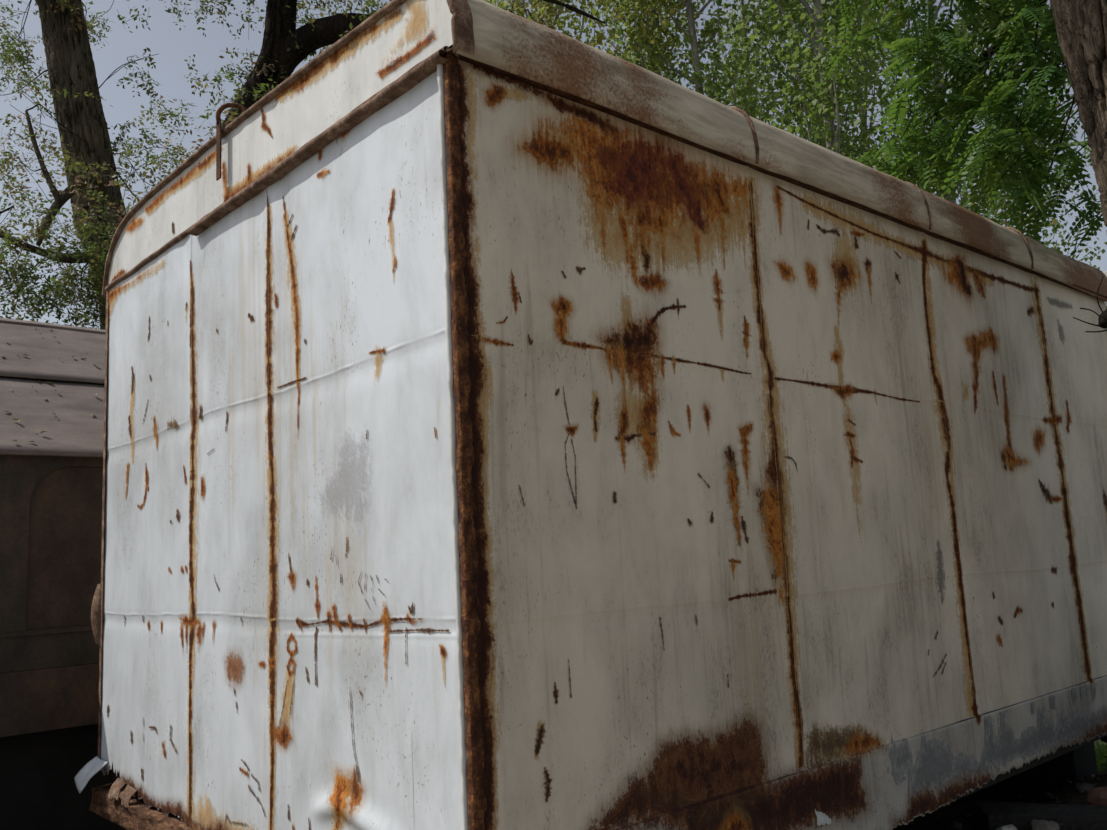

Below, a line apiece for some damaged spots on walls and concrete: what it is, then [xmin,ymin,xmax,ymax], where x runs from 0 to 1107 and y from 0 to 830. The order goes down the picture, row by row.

rust [104,260,254,830]
rust [126,146,297,233]
rust [258,190,449,830]
rust [275,0,435,102]
rust [457,59,1095,830]